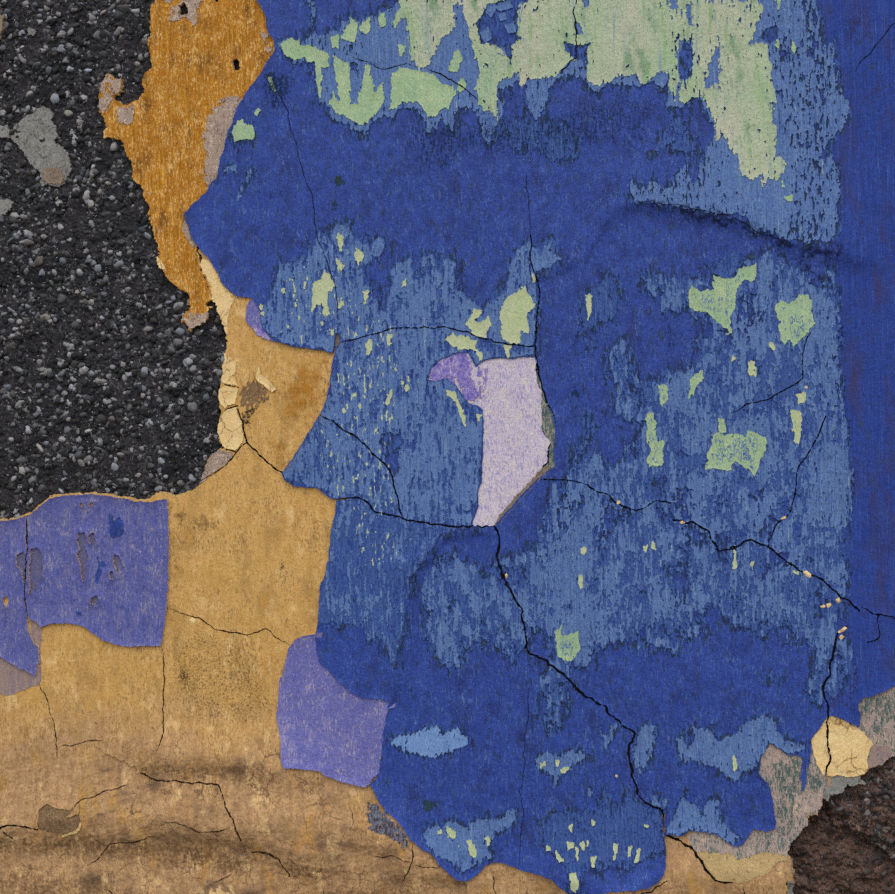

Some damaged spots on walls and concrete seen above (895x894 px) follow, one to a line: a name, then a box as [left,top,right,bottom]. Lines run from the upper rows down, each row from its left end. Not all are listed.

crack [856,23,895,69]
crack [730,330,812,414]
crack [173,609,289,645]
crack [320,415,745,894]
crack [540,416,895,775]
crack [40,687,102,753]
crack [157,649,165,750]
peeling [530,717,626,791]
peeling [626,717,668,784]
crack [0,825,37,838]
crack [72,785,125,810]
crack [92,773,289,874]